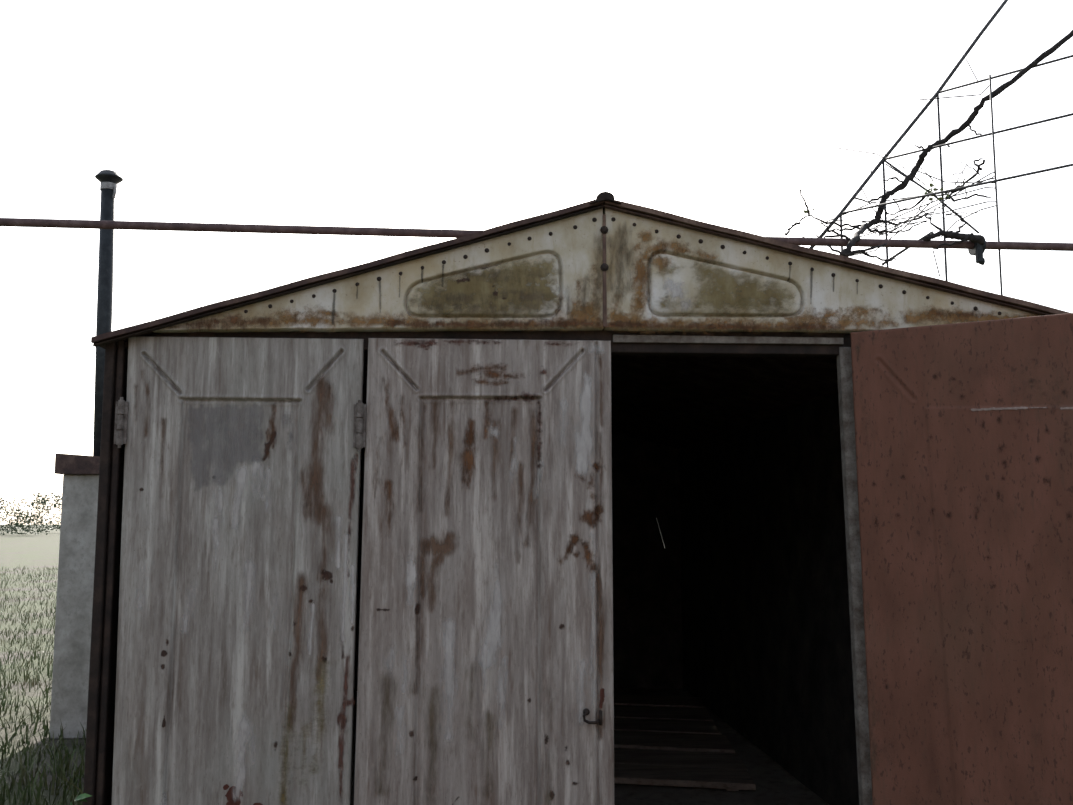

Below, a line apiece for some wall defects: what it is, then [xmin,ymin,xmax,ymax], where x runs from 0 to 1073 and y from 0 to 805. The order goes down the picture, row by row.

leakage [418,259,569,316]
corrosion [170,232,1041,350]
leakage [694,263,792,313]
corrosion [288,379,333,726]
corrosion [348,454,358,541]
corrosion [421,533,455,603]
corrosion [419,364,542,523]
corrosion [560,535,604,681]
corrosion [578,382,603,528]
peeling [223,717,262,805]
corrosion [337,652,354,796]